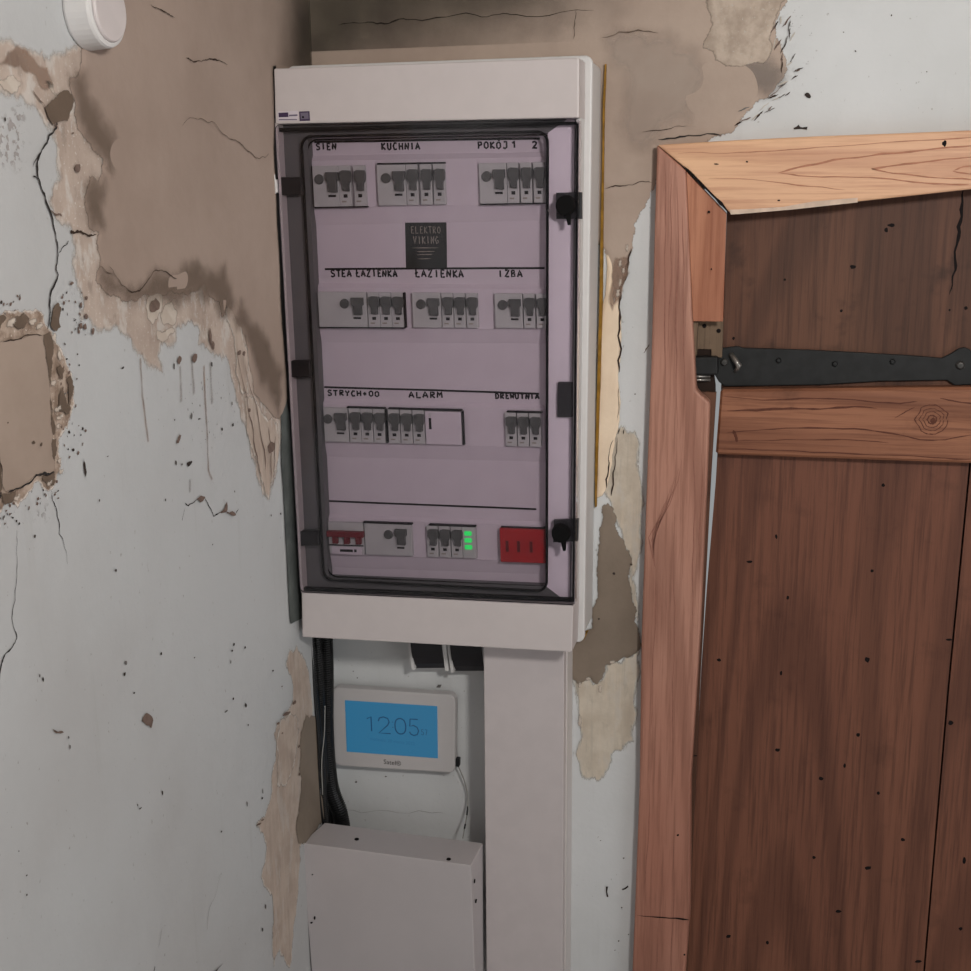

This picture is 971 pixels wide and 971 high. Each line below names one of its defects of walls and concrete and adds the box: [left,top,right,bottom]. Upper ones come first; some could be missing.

crack [4,123,96,342]
crack [101,266,177,293]
flaking render [0,0,802,525]
crack [0,579,17,673]
crack [0,462,67,553]
flaking render [572,426,644,781]
peeling [256,646,324,967]